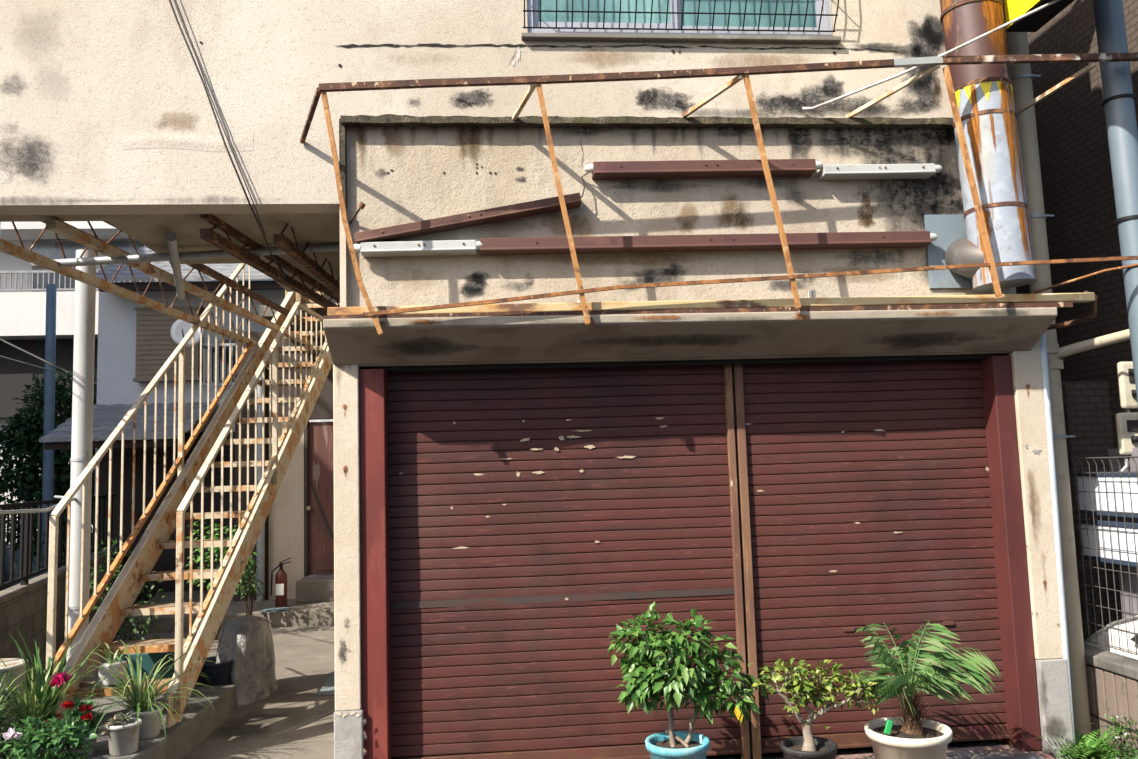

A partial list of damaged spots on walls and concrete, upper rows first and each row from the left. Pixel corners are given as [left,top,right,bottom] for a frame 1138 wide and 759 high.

rust [982,0,1007,52]
crack [339,43,903,64]
leakage [455,90,492,107]
leakage [636,16,964,231]
leakage [3,141,48,175]
leakage [624,180,679,191]
rust [967,81,1032,259]
leakage [460,273,488,297]
peeling [520,419,595,451]